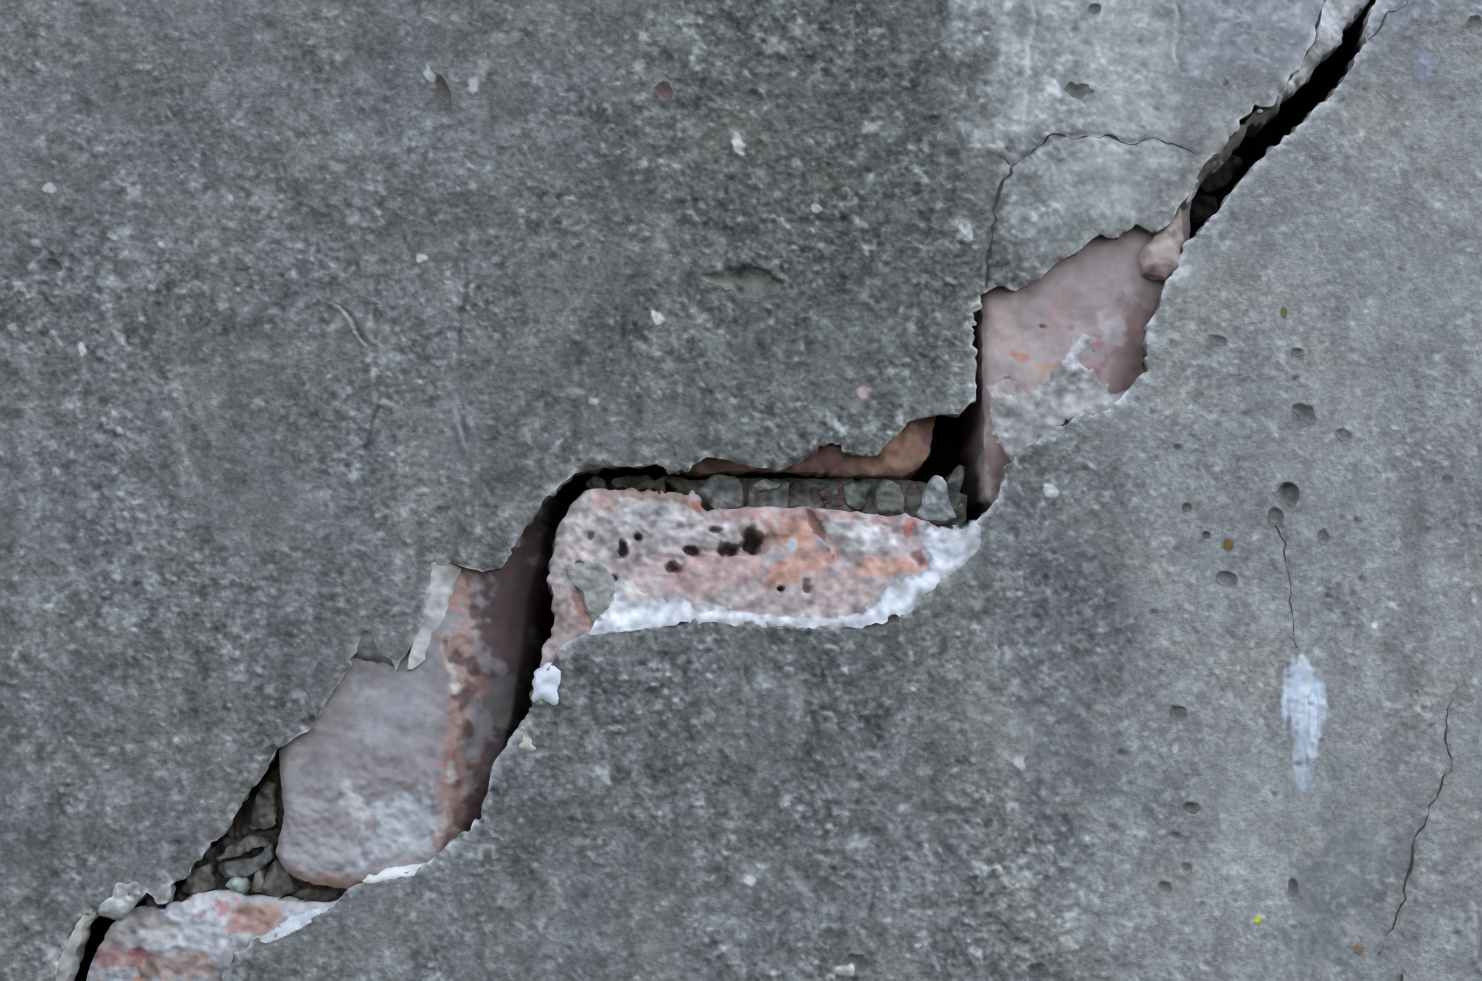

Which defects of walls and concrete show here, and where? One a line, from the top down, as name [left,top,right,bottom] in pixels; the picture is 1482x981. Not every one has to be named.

crack [986,0,1408,288]
spalling [1201,67,1301,170]
spalling [1219,0,1376,210]
crack [559,466,668,507]
crack [909,413,979,527]
crack [546,595,554,639]
spalling [86,195,1215,981]
crack [1275,525,1297,648]
crack [1378,689,1457,981]
crack [56,904,140,981]